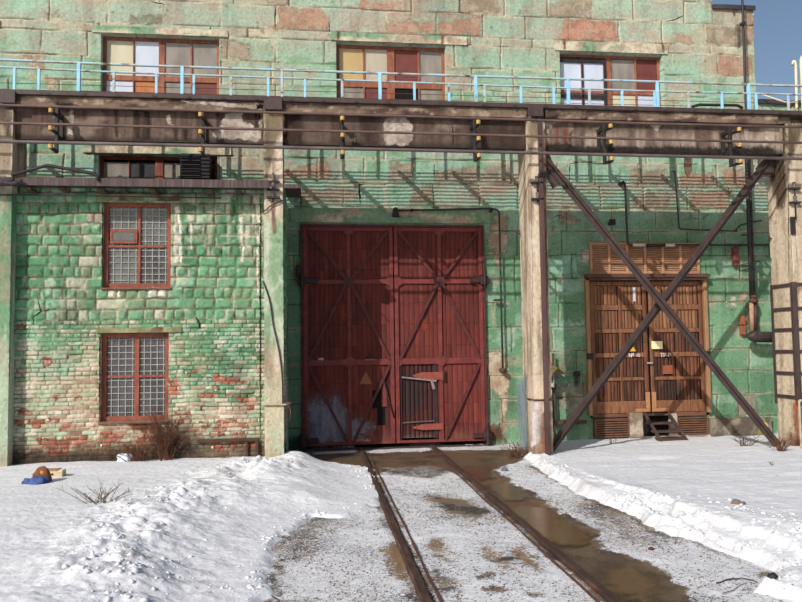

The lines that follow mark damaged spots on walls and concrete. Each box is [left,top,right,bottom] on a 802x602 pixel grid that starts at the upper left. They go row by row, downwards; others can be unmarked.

spalling [181,99,264,142]
spalling [383,117,414,146]
flaking render [198,374,259,411]
flaking render [13,408,123,456]
flaking render [176,411,256,451]